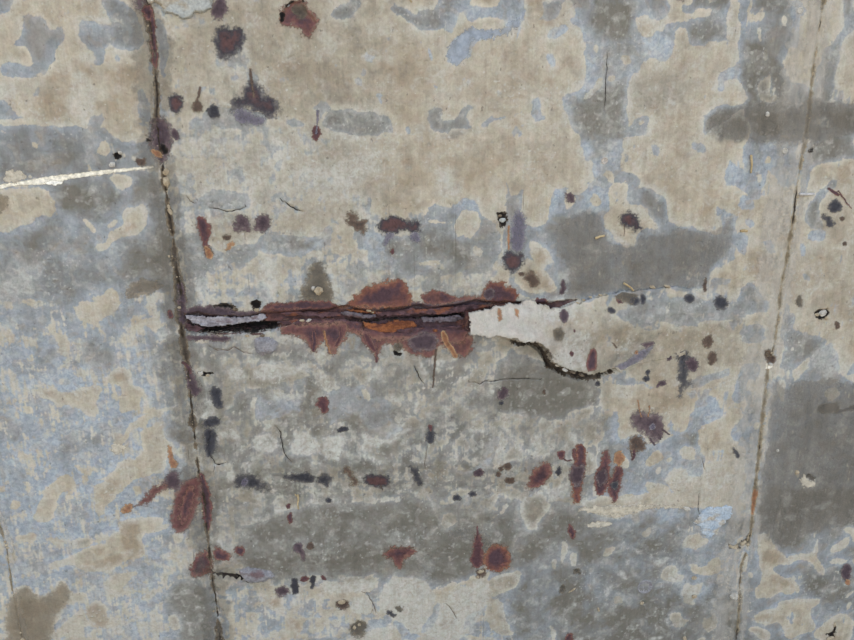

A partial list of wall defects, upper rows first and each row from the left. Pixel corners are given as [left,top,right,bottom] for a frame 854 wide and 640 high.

corrosion [265,300,337,310]
corrosion [281,321,348,355]
crack [184,295,577,354]
corrosion [348,278,456,310]
corrosion [359,323,473,388]
peeling [468,285,717,377]
corrosion [526,400,670,504]
corrosion [120,445,213,533]
crack [212,570,249,583]
corrosion [469,526,511,572]